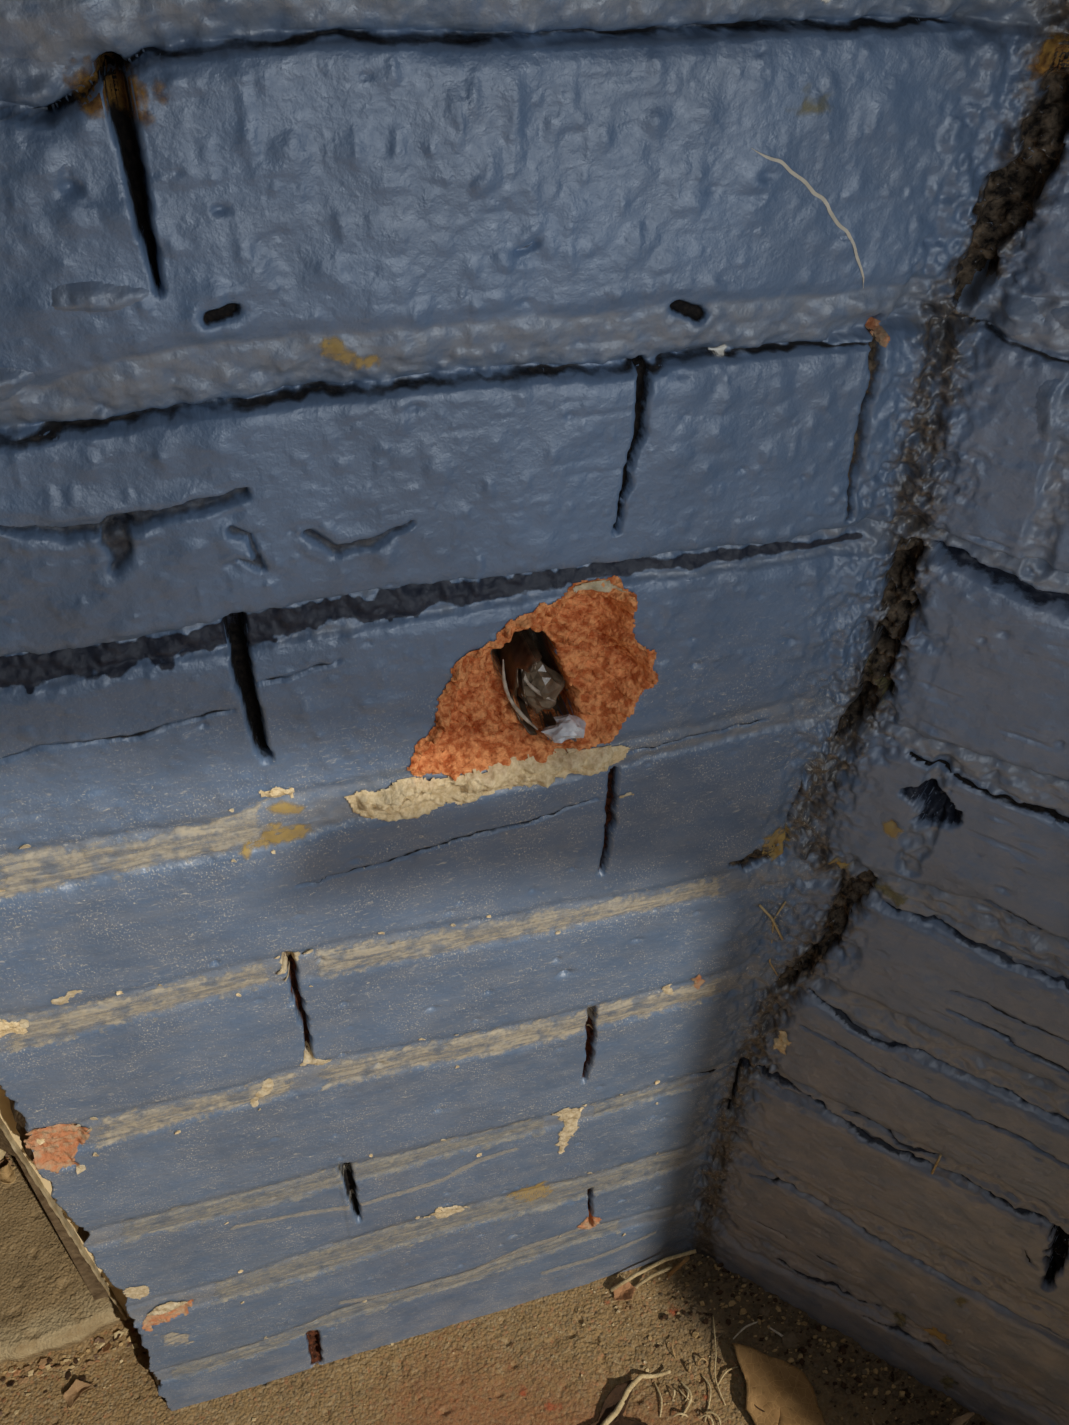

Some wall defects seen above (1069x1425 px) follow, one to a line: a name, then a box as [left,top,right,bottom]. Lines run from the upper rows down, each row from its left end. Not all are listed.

crack [35,47,189,287]
crack [953,36,1069,363]
crack [0,327,878,756]
spalling [344,575,658,822]
crack [835,537,1069,736]
peeling [0,786,294,897]
crack [283,953,310,1051]
crack [339,1162,360,1215]
peeling [0,878,719,1052]
peeling [24,974,720,1175]
peeling [123,1080,690,1243]
spalling [123,1285,194,1332]